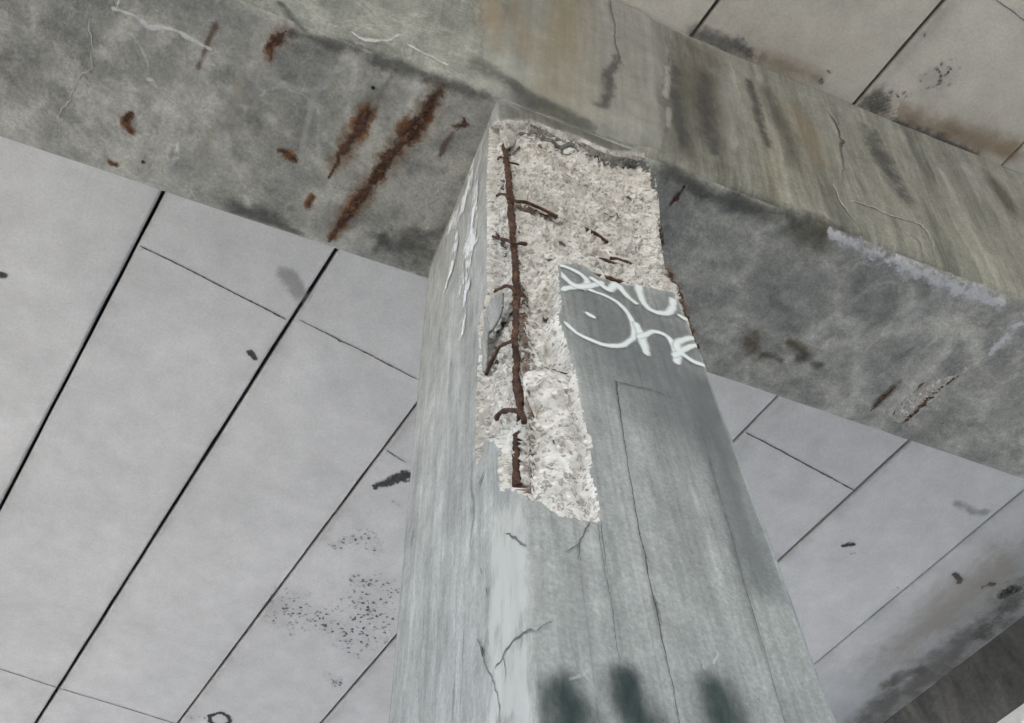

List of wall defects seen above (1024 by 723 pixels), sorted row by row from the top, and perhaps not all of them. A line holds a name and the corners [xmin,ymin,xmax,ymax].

rust [197,24,218,68]
rust [264,31,287,60]
crack [600,0,624,106]
rust [120,110,135,135]
rust [327,73,443,242]
damp [663,165,1006,307]
spalling [443,119,699,523]
spalling [885,363,971,423]
crack [477,620,555,712]